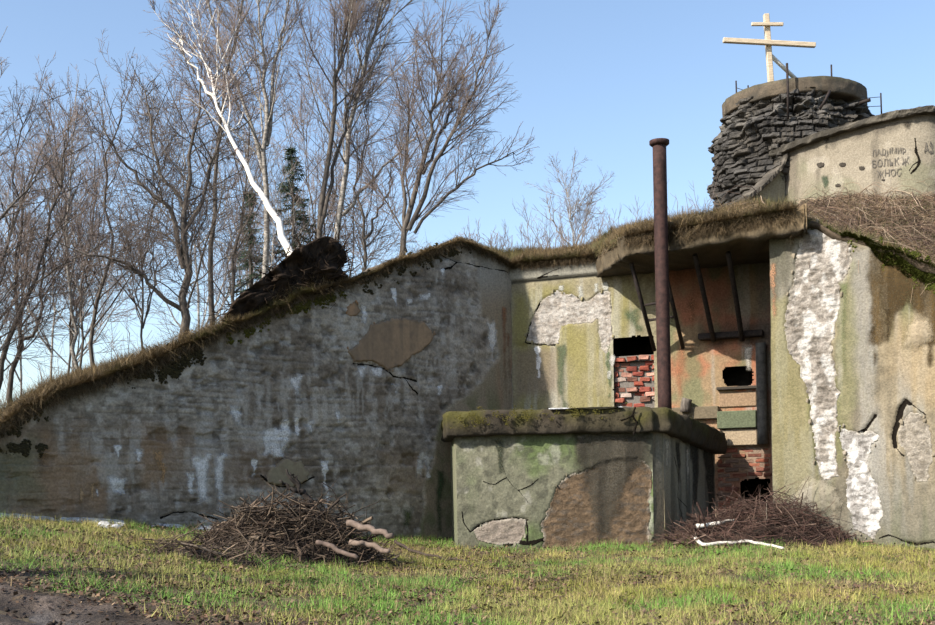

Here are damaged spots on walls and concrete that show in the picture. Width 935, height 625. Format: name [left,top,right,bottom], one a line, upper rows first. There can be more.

crack [909,138,921,174]
spalling [524,289,614,353]
damp [867,244,935,365]
crack [353,363,418,395]
spalling [784,219,883,539]
spalling [898,412,935,482]
damp [187,454,225,511]
spalling [474,517,526,548]
crack [461,511,544,547]
crack [483,460,539,496]
spalling [540,460,653,548]
crack [879,534,935,546]